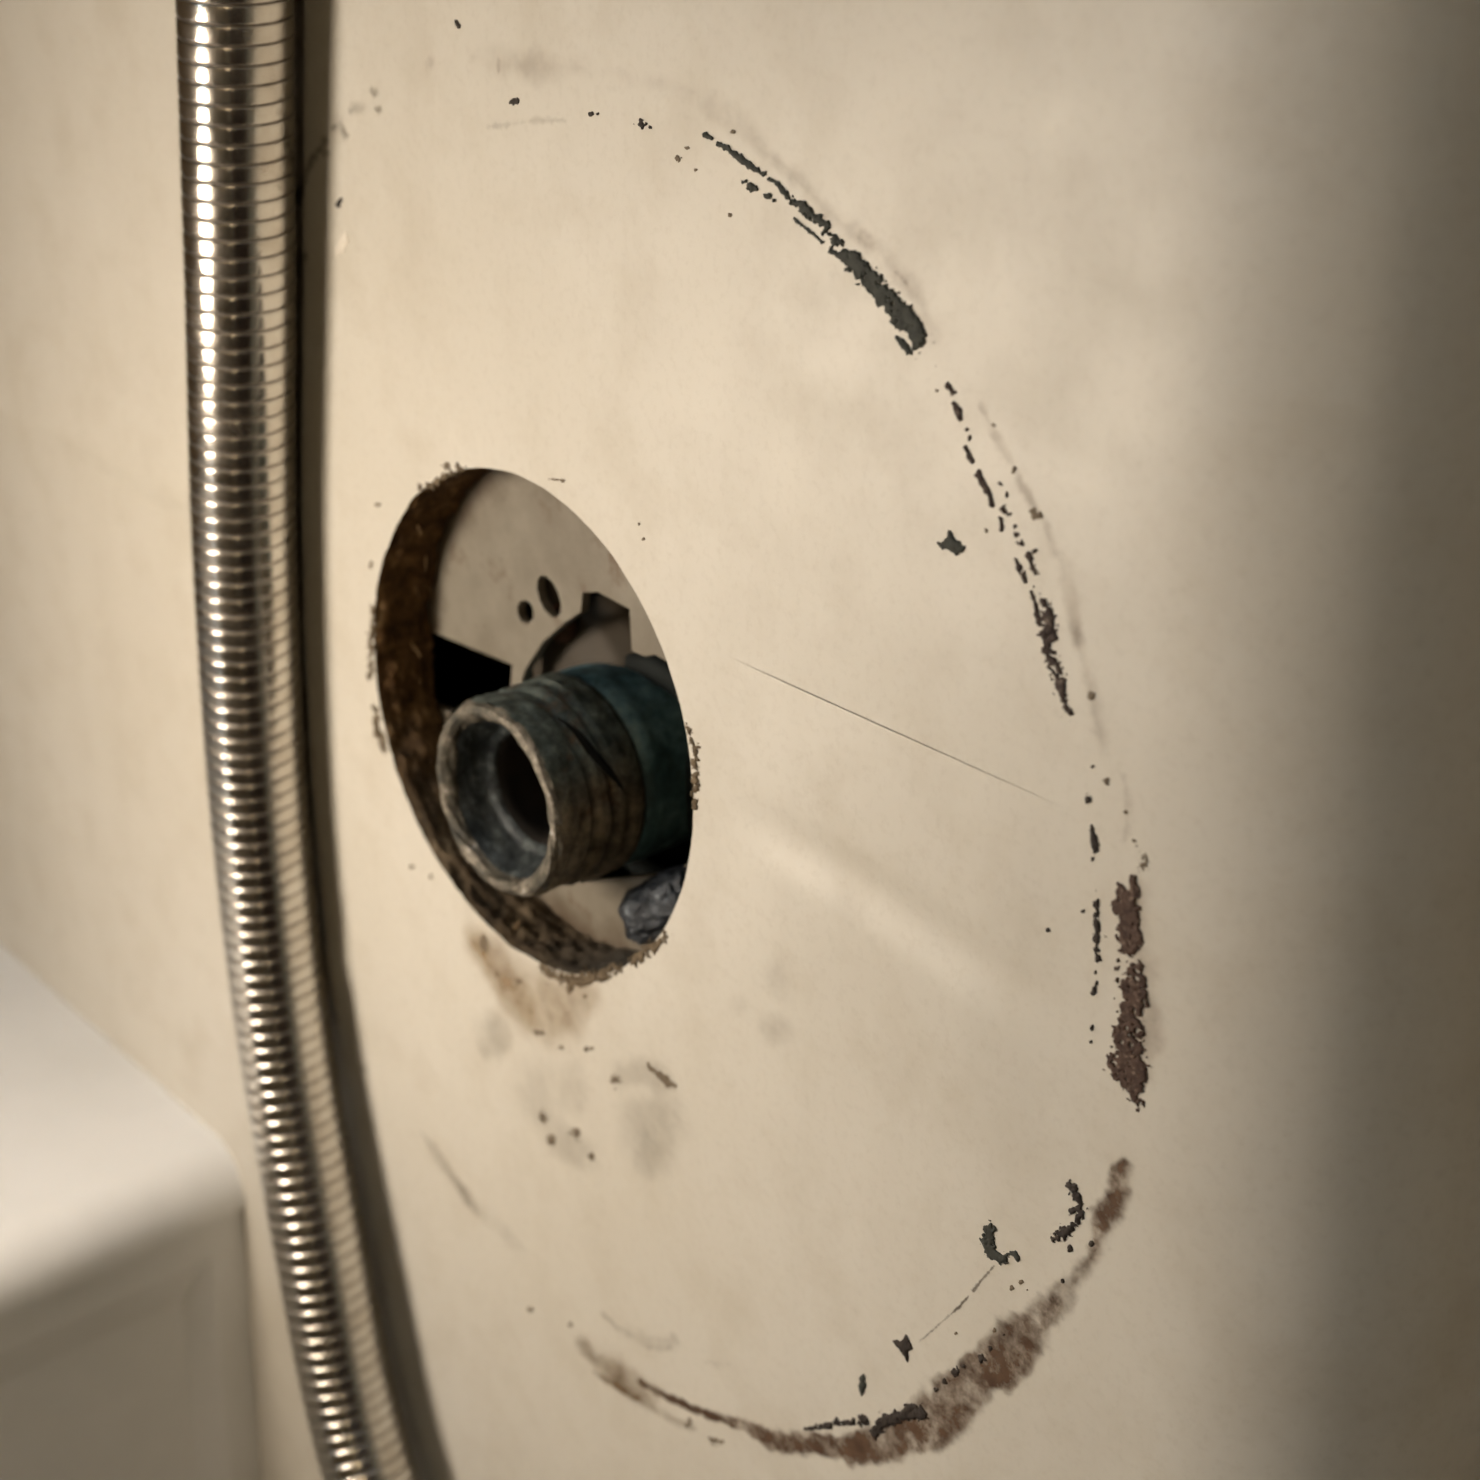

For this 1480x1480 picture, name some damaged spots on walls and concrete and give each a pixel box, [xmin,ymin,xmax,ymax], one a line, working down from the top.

peeling [702,132,927,355]
peeling [936,530,966,556]
peeling [945,382,1074,716]
peeling [979,1220,1020,1266]
peeling [1050,1179,1088,1252]
corrosion [1074,1159,1128,1282]
corrosion [603,1294,1061,1465]
peeling [892,1335,913,1362]